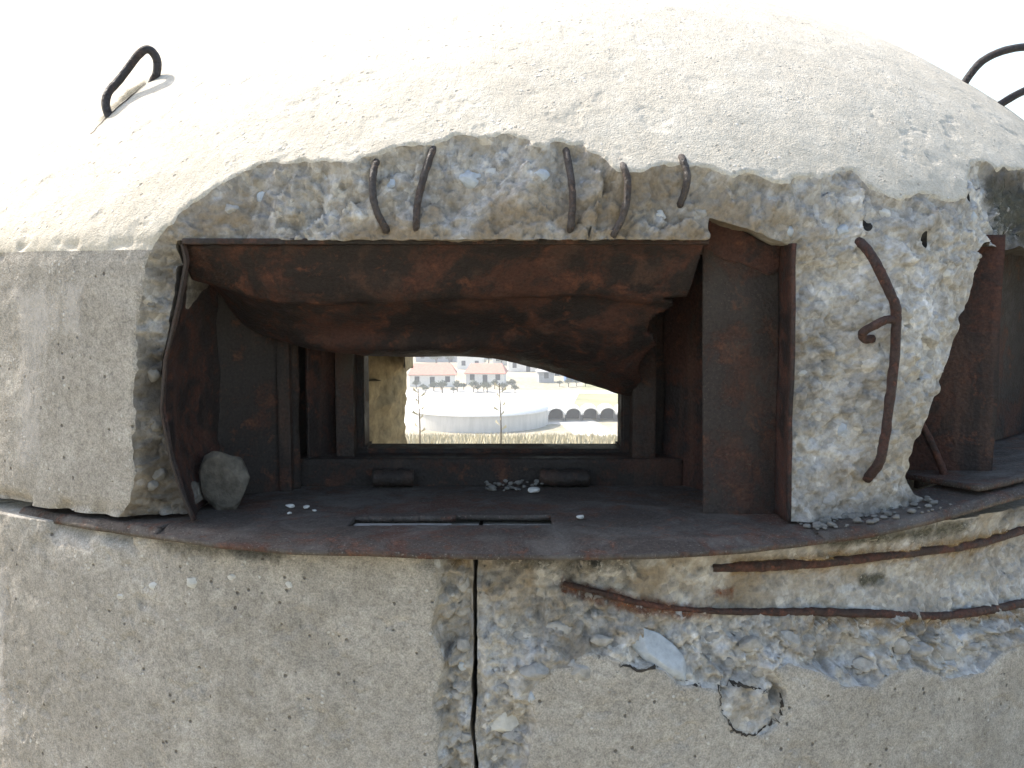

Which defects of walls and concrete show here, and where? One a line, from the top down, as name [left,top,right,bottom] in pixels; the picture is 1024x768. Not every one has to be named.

spalling [119,134,1024,522]
corrosion [561,584,708,617]
spalling [431,506,1024,768]